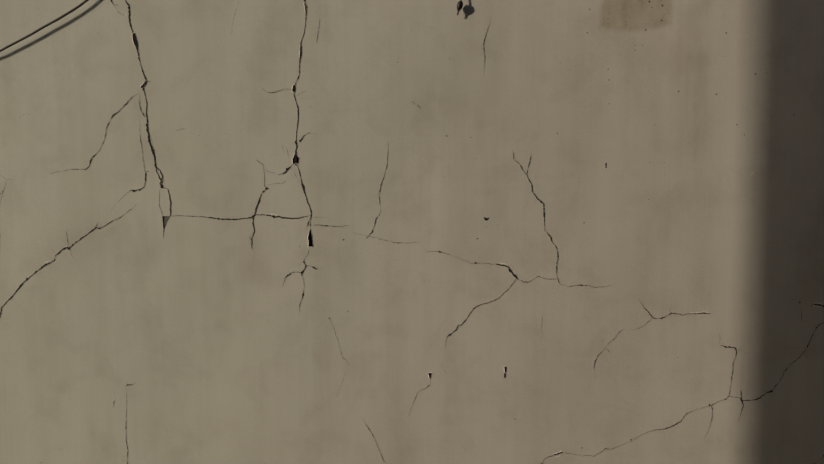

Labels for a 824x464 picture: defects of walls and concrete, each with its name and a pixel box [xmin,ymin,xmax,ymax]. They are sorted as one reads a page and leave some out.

crack [0,0,452,317]
crack [445,153,610,346]
crack [541,302,824,464]